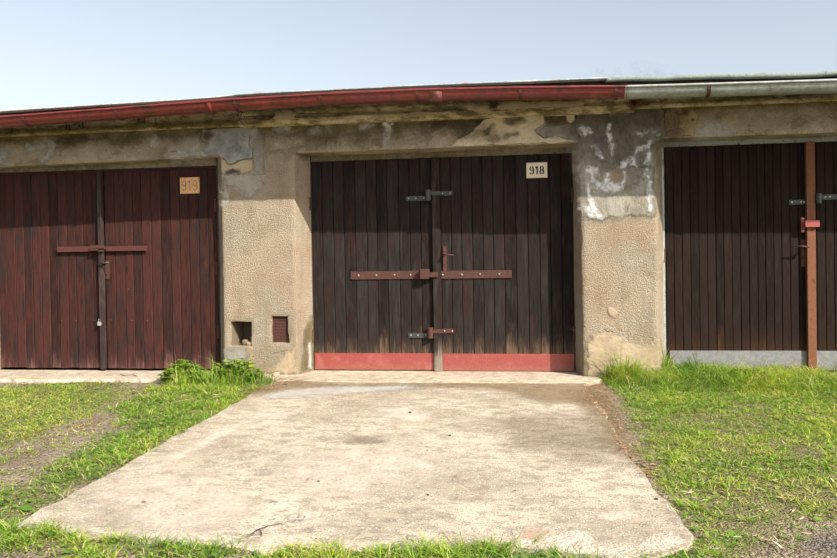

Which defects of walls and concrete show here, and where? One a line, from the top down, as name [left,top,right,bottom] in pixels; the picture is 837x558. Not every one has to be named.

peeling [201,127,256,174]
leakage [302,320,314,371]
leakage [263,382,601,413]